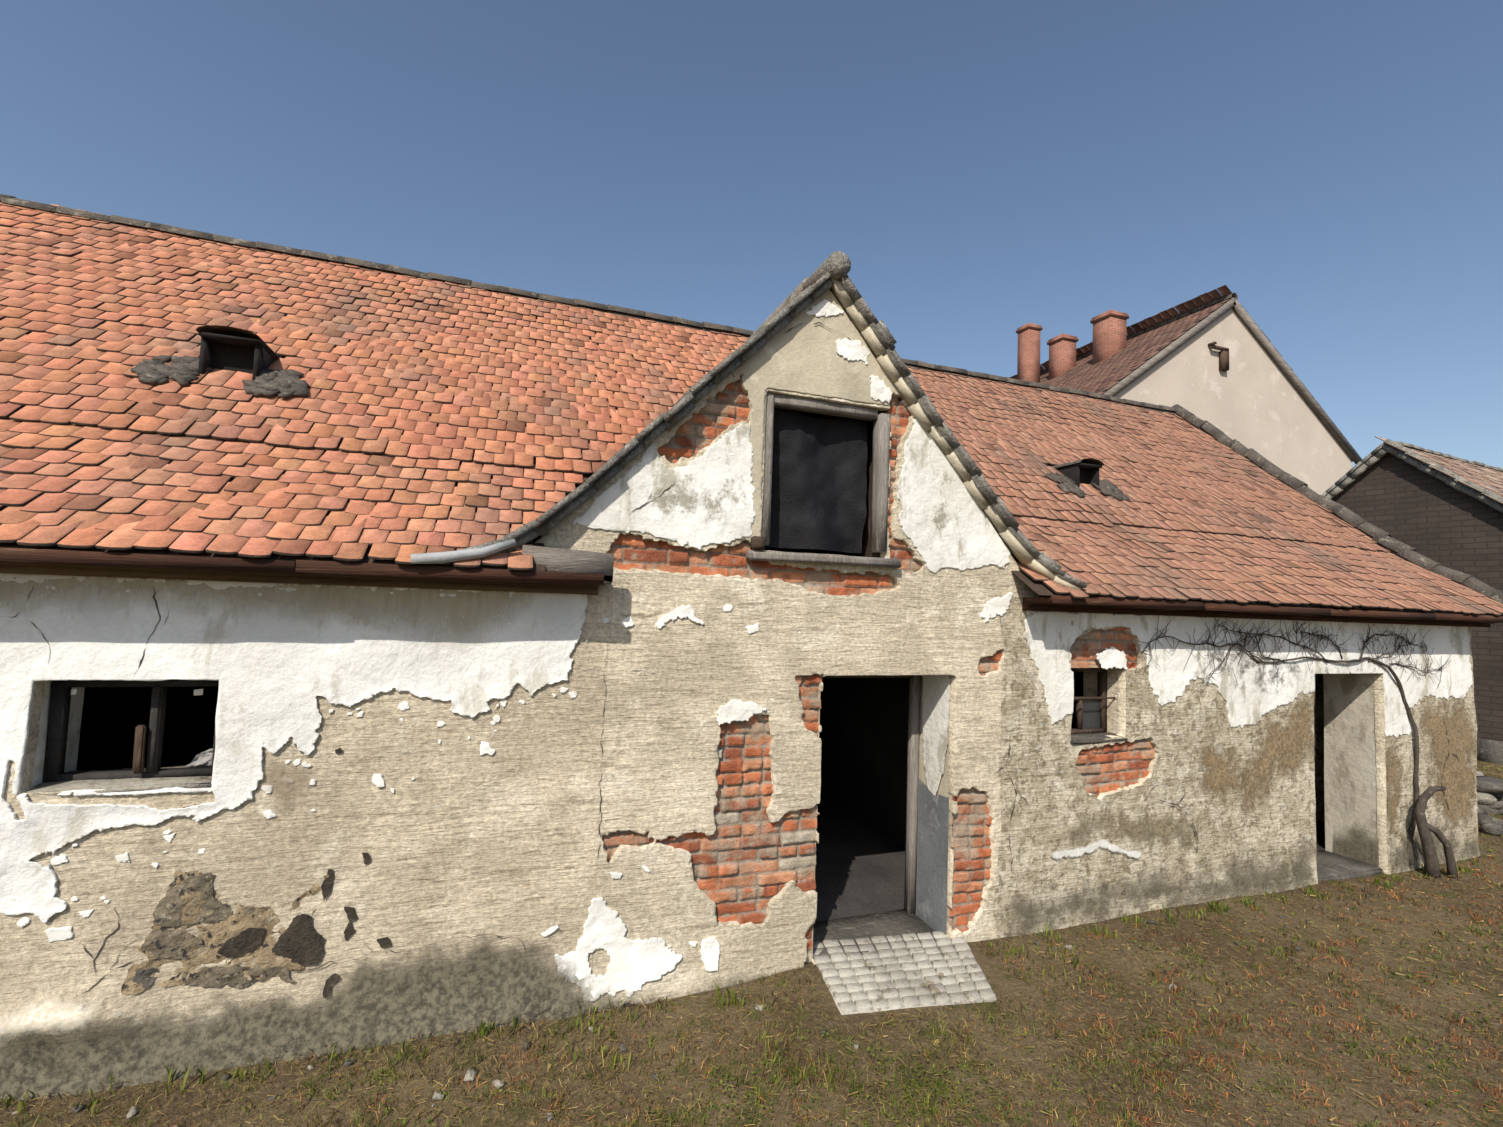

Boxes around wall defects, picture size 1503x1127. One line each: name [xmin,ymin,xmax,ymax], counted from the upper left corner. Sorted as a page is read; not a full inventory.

peeling [805,299,844,318]
flaking render [0,338,922,1050]